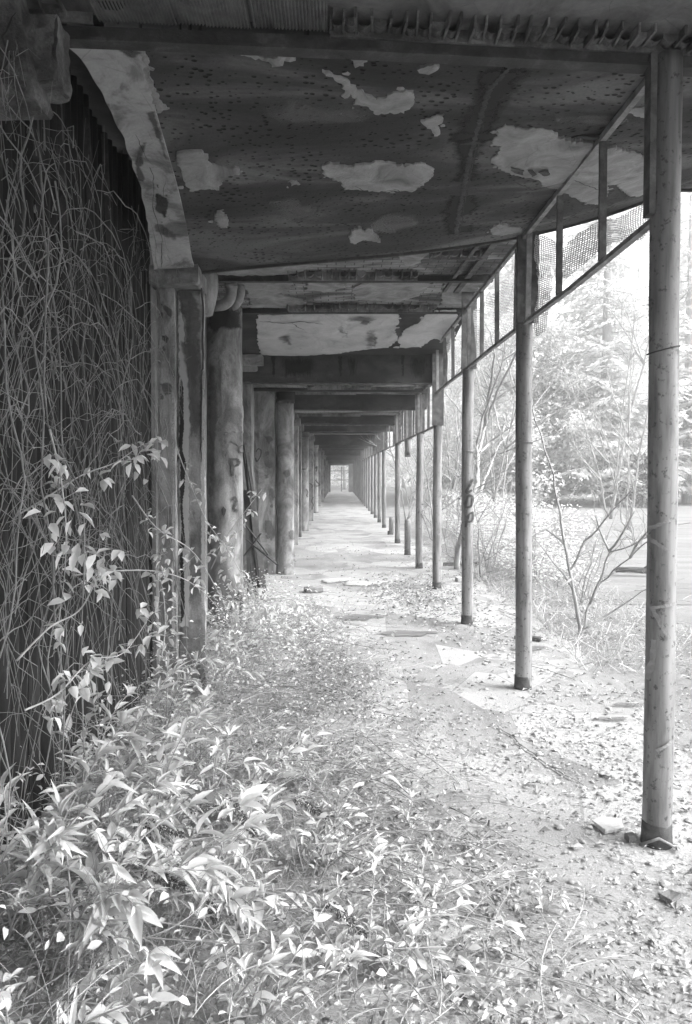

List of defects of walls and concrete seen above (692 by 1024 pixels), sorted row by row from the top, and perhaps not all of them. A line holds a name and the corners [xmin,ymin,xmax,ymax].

flaking render [141,51,170,113]
flaking render [322,60,415,115]
flaking render [417,63,440,75]
flaking render [420,113,445,137]
flaking render [175,149,243,192]
flaking render [322,160,434,197]
flaking render [490,124,644,205]
spalling [155,185,168,218]
flaking render [208,209,229,228]
flaking render [348,226,380,244]
flaking render [217,264,483,356]